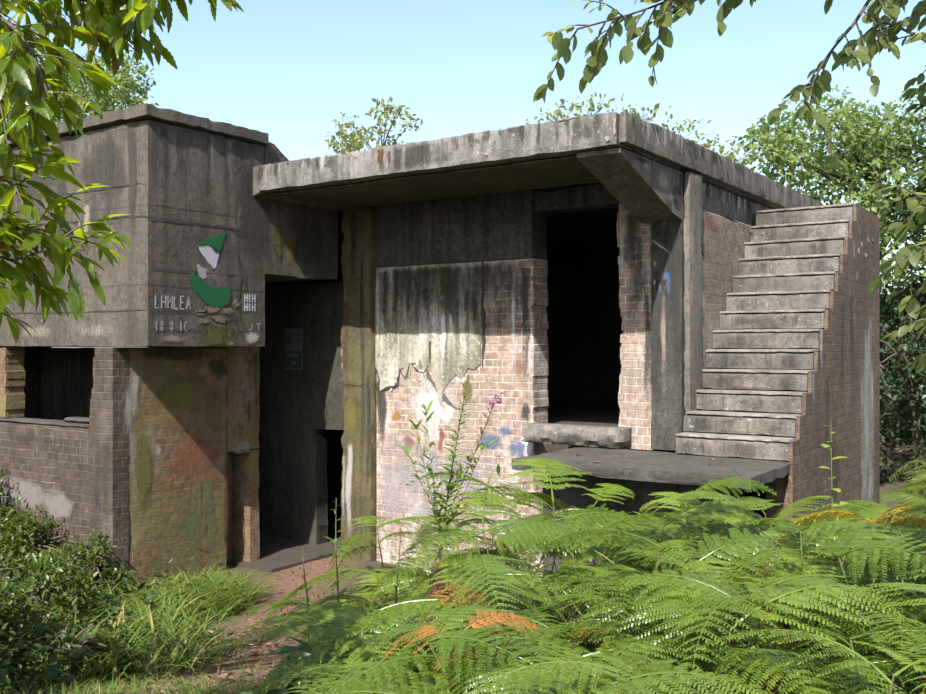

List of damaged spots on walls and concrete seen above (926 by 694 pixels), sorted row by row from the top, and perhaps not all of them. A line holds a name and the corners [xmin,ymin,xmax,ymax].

damp [394,143,448,168]
damp [417,269,453,362]
crack [342,360,421,392]
damp [126,377,138,425]